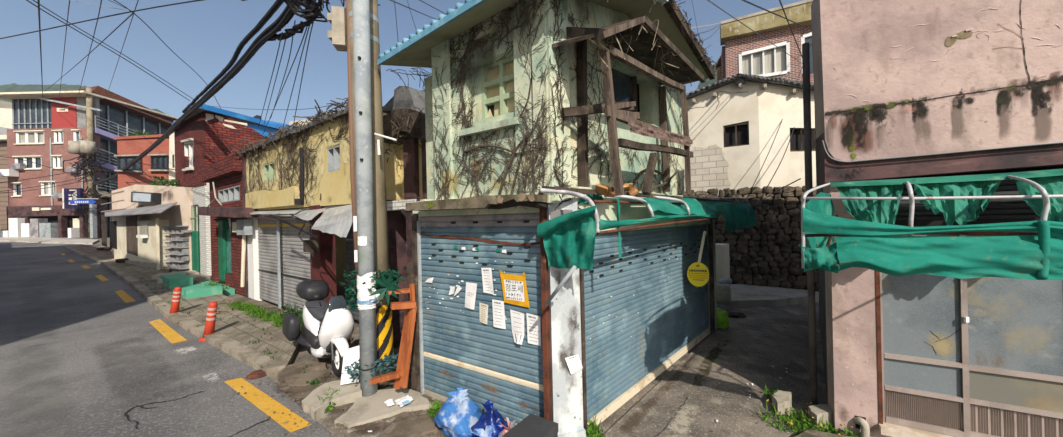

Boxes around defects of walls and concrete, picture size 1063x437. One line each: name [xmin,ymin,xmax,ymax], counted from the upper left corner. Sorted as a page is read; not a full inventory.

crack [825,0,1063,118]
leakage [828,105,888,175]
leakage [904,99,930,135]
leakage [952,91,974,136]
leakage [997,73,1060,139]